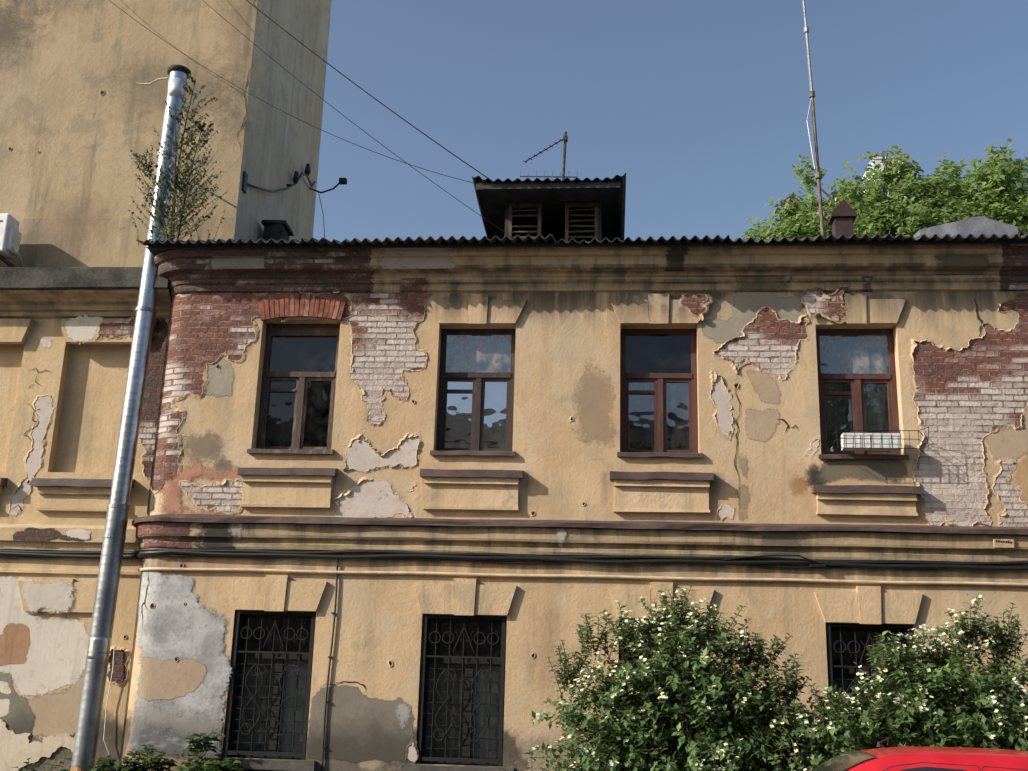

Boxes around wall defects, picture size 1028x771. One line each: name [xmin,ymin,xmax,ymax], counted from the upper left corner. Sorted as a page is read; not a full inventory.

flaking render [7,394,56,517]
crack [24,368,50,444]
peeling [63,314,135,345]
flaking render [138,291,436,539]
flaking render [708,285,848,440]
flaking render [910,291,1028,534]
flaking render [12,527,91,542]
peeling [0,575,89,771]
water stain [306,685,415,764]